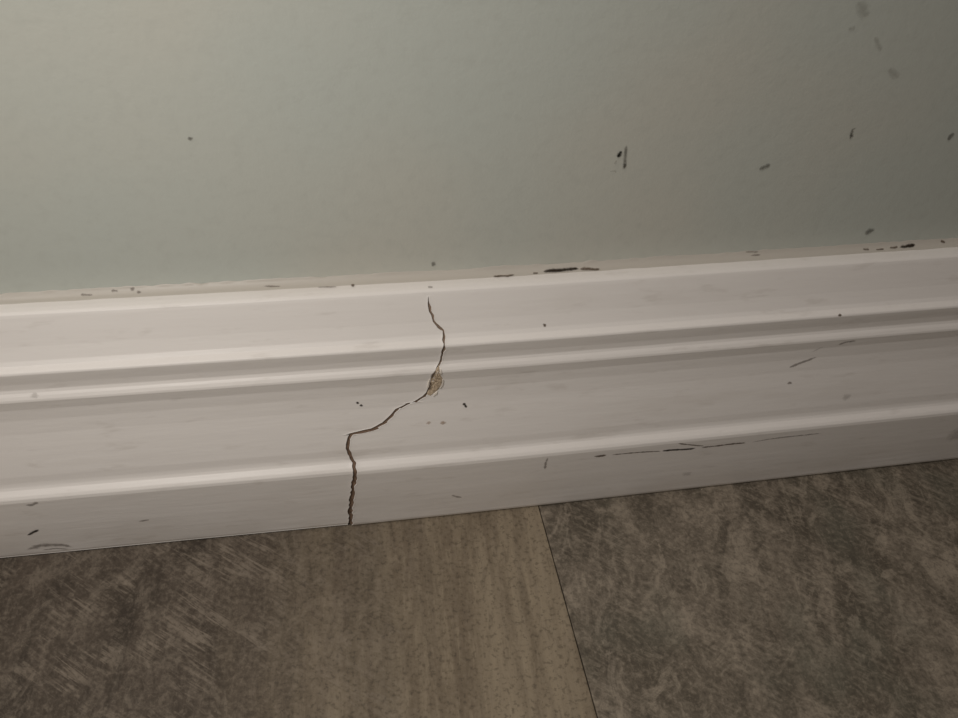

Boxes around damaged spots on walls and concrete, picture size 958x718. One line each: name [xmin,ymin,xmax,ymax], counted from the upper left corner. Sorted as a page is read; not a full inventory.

crack [346,297,446,525]